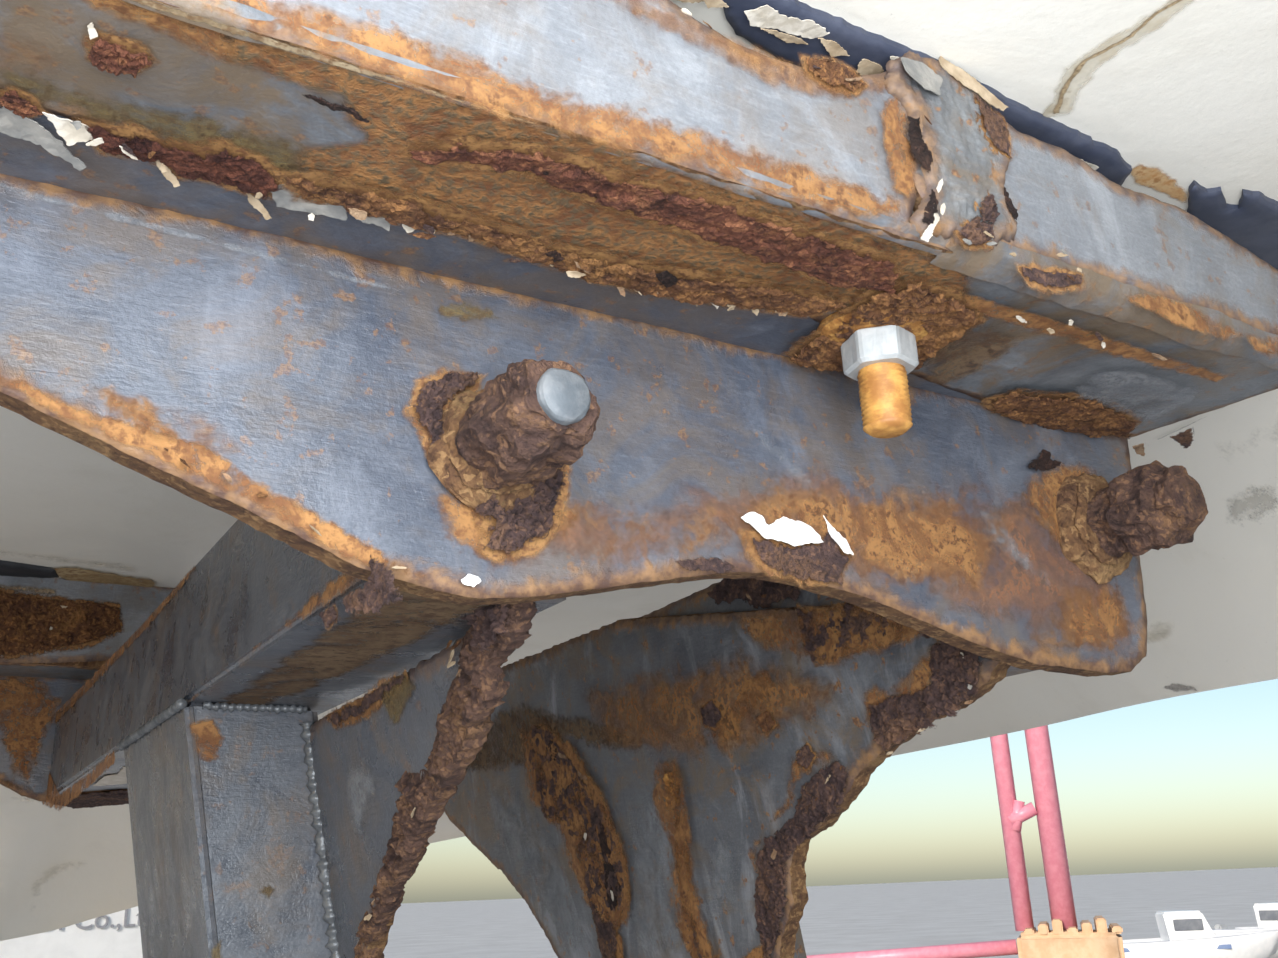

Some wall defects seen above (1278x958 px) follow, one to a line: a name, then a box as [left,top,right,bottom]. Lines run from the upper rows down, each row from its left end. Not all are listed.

peeling [677,0,729,8]
peeling [744,5,830,45]
crack [1053,0,1182,114]
spalling [0,106,348,221]
rust [0,0,1225,384]
rust [1129,294,1278,356]
rust [982,388,1143,439]
peeling [741,512,854,555]
rust [442,449,1127,755]
rust [0,368,631,958]
rust [653,761,713,958]
rust [743,742,848,958]